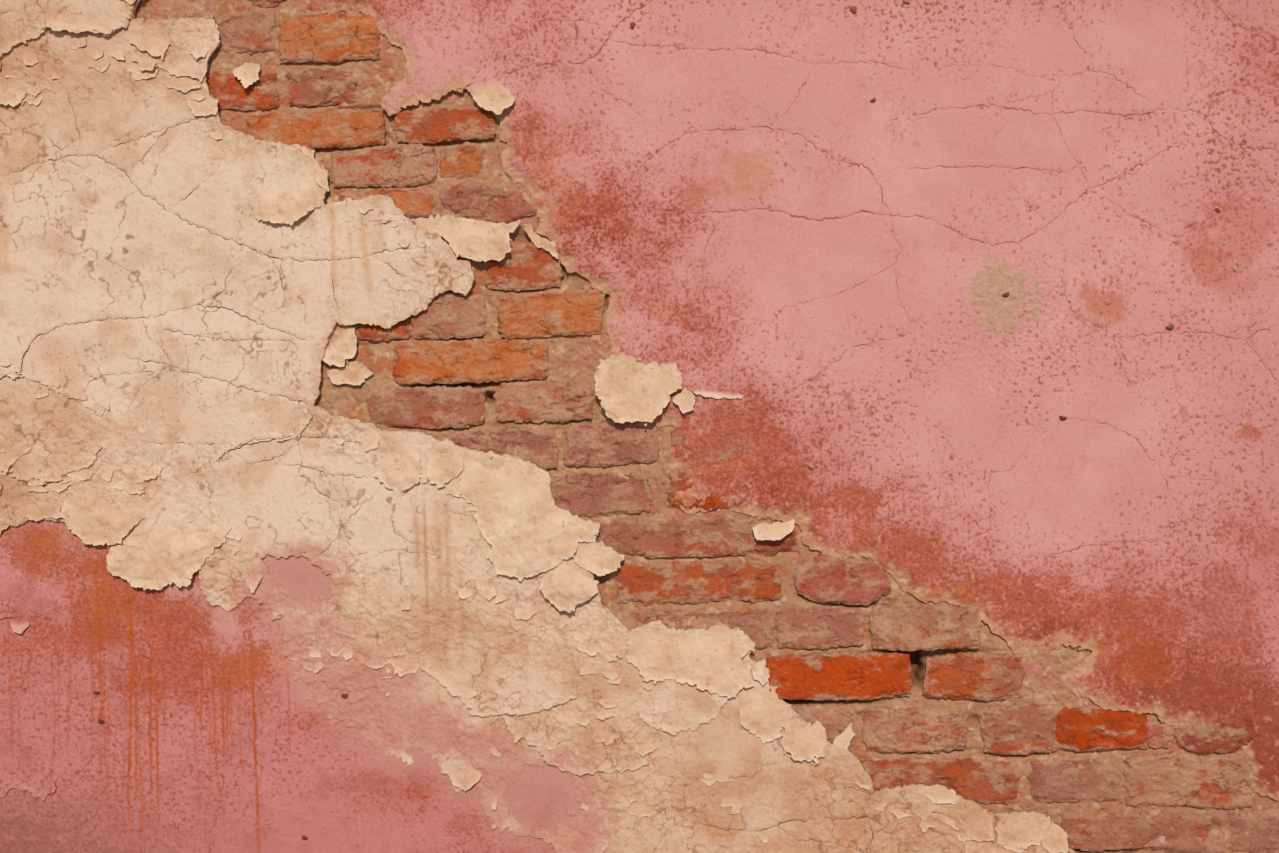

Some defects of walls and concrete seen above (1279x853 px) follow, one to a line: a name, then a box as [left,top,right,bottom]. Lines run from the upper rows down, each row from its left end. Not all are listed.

flaking render [233,62,260,88]
flaking render [467,70,515,115]
crack [6,97,412,409]
crack [448,0,1278,391]
flaking render [594,353,685,424]
flaking render [673,388,743,413]
crack [147,436,465,560]
flaking render [454,451,625,582]
crack [930,425,1024,561]
crack [1021,418,1262,576]
rust [1,516,293,853]
flaking render [626,620,770,736]